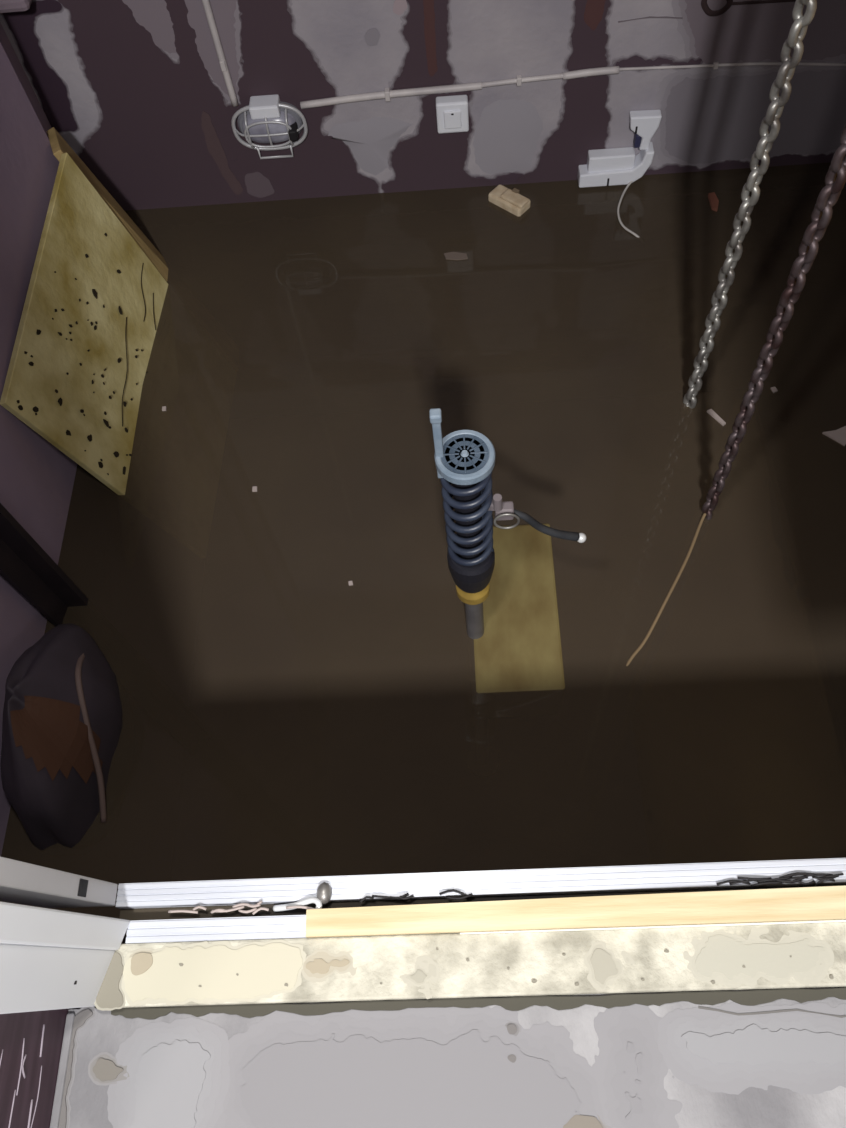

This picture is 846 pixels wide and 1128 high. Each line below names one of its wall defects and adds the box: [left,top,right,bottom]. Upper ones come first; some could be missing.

spalling [393,0,407,15]
spalling [245,172,274,198]